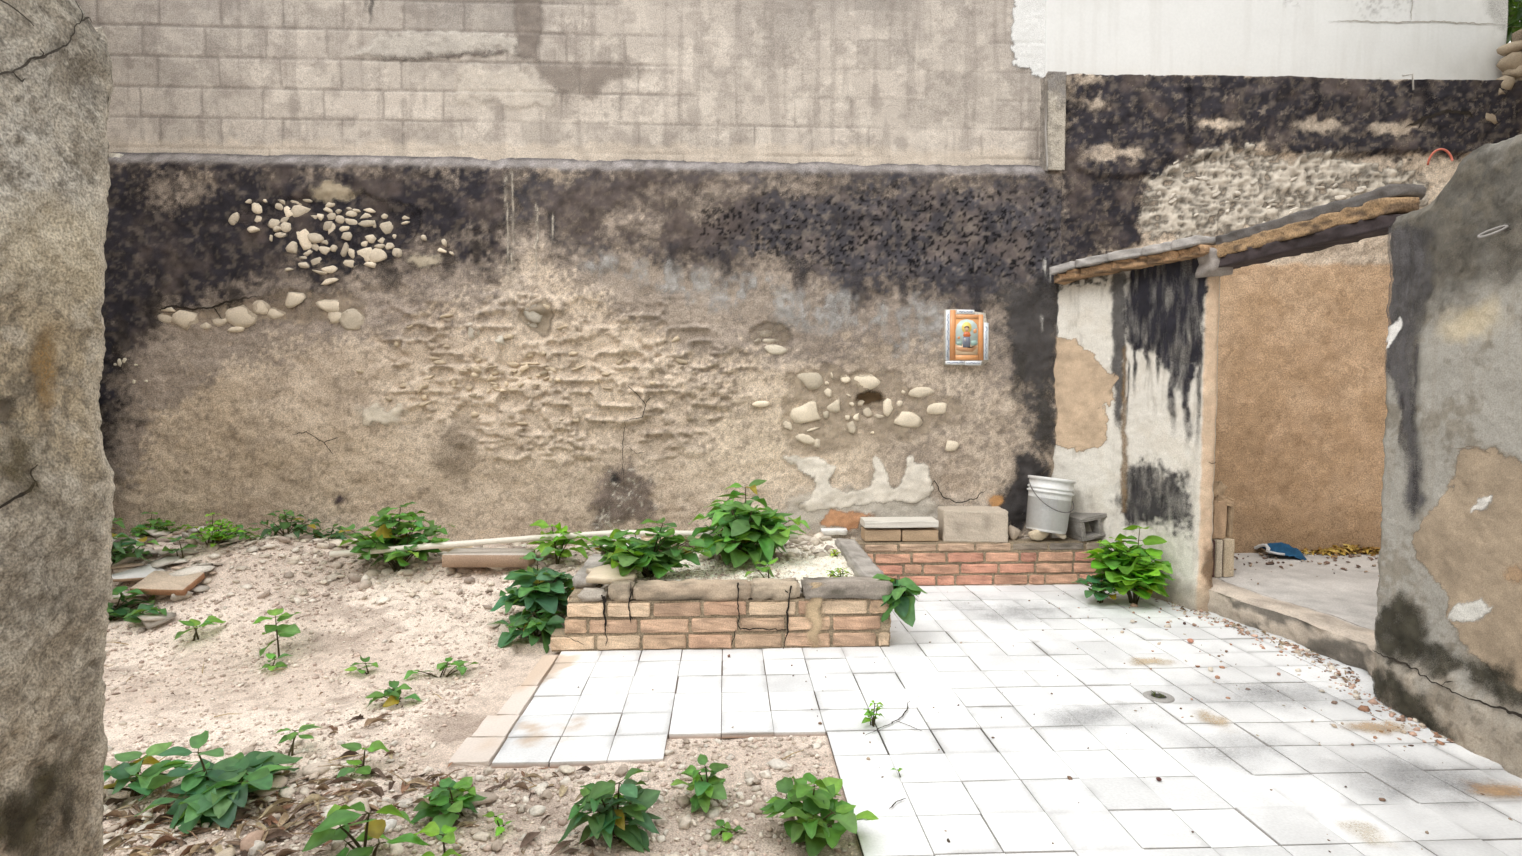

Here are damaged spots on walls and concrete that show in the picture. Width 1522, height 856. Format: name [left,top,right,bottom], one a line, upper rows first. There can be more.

crack [0,0,92,83]
leakage [514,0,635,98]
spalling [157,180,454,333]
spalling [753,323,791,355]
leakage [99,73,1522,536]
spalling [752,364,964,533]
flaking render [1053,336,1119,452]
crack [1373,650,1522,718]